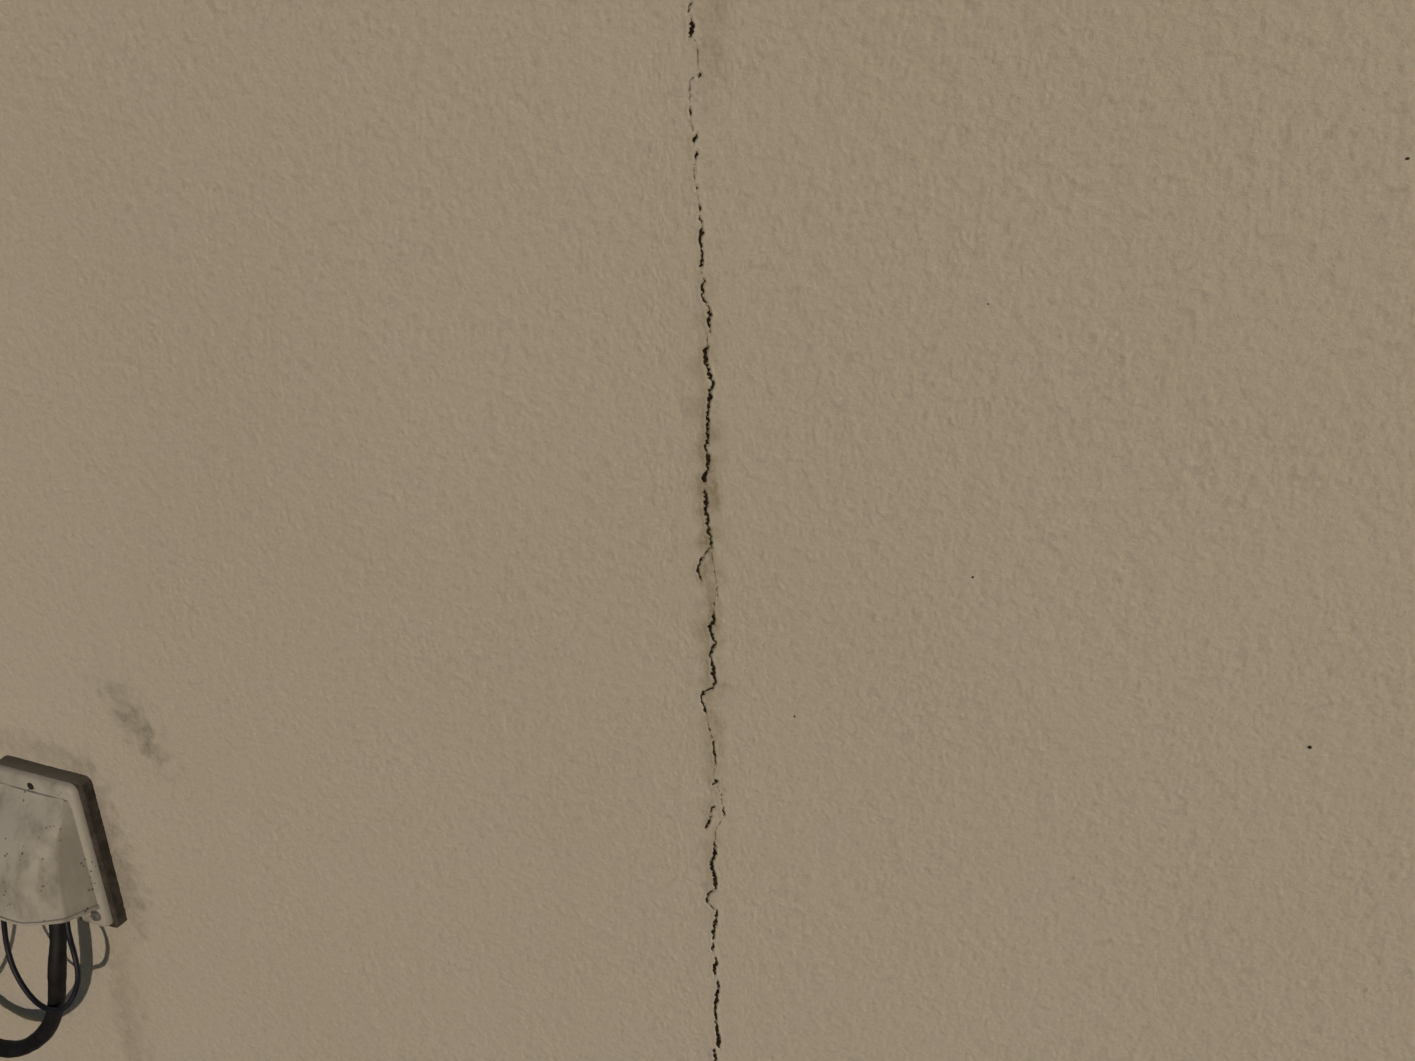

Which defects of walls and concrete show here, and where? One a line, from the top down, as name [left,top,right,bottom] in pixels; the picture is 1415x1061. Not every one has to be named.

crack [688,3,725,1061]